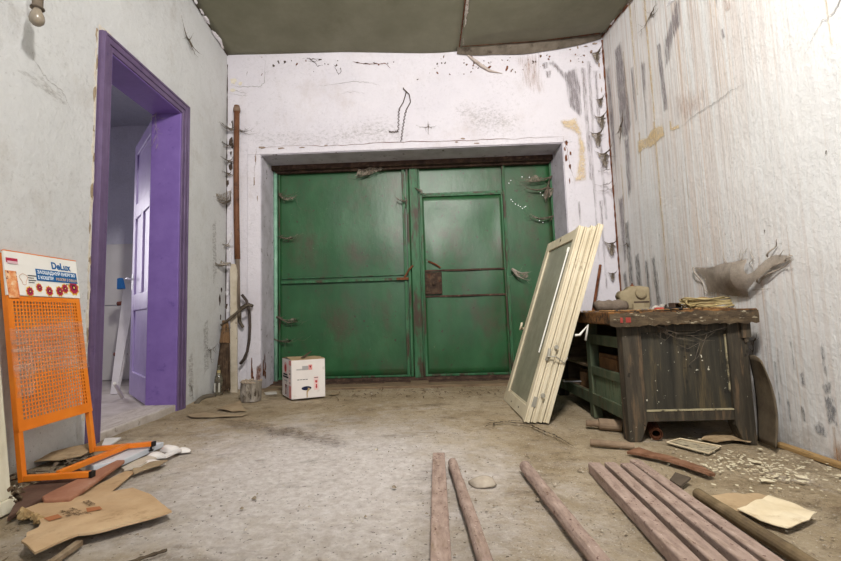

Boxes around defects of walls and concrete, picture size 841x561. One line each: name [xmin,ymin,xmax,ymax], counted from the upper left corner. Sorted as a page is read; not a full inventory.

peeling [194,0,224,49]
crack [601,0,633,291]
crack [486,419,573,446]
water stain [815,383,837,435]